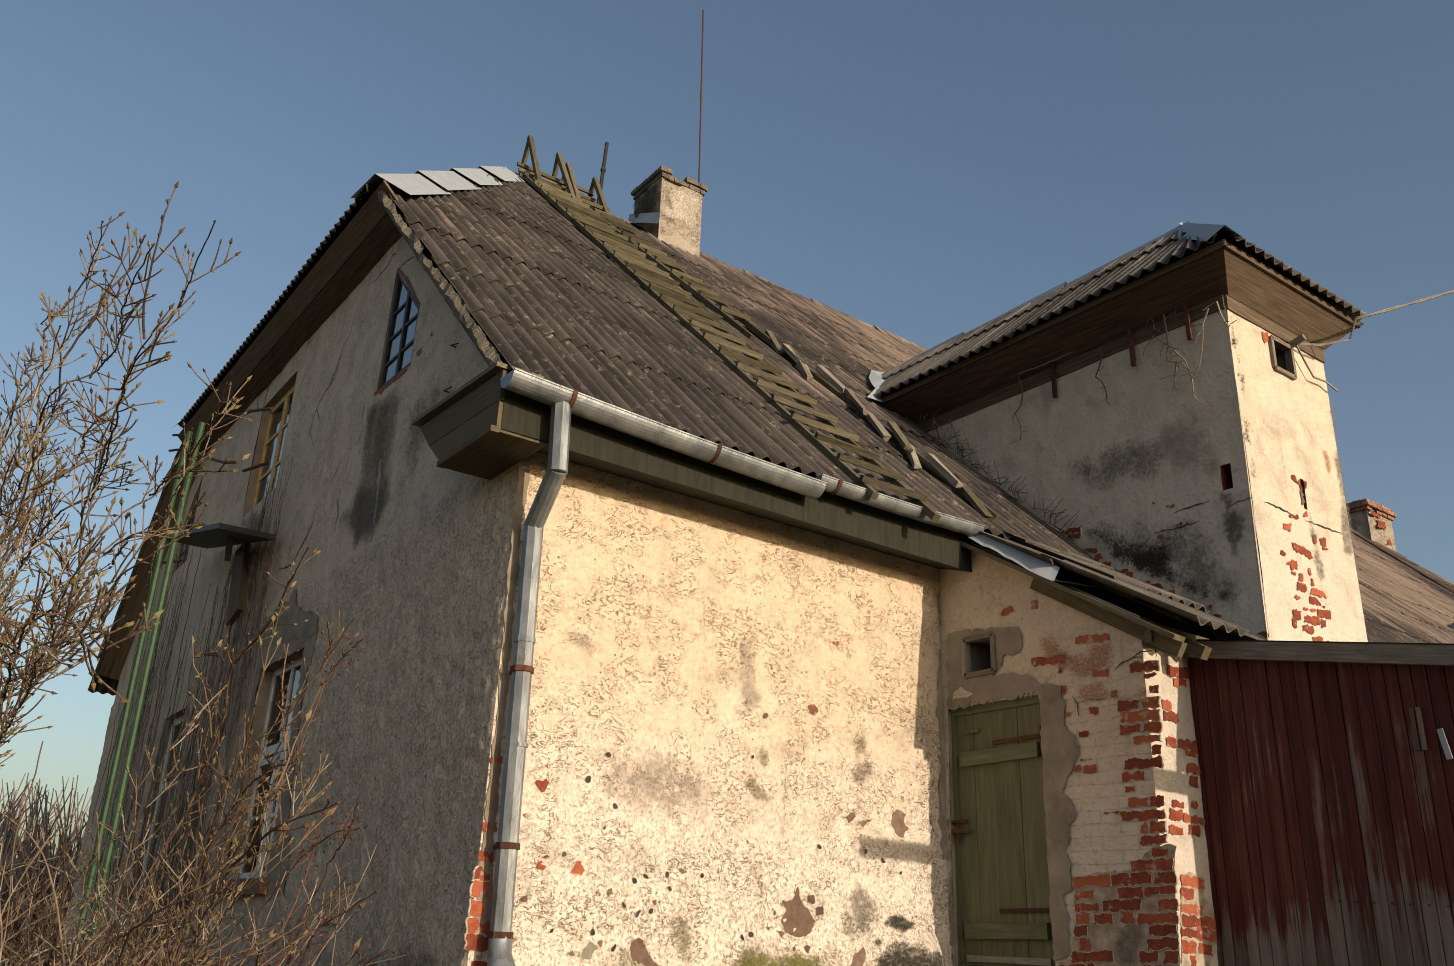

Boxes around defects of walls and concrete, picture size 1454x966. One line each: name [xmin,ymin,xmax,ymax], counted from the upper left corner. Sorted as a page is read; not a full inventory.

damp [347,392,438,539]
damp [1090,526,1234,599]
flaking render [1281,475,1331,641]
flaking render [1031,633,1217,966]
flaking render [463,850,494,966]
flaking render [741,884,824,954]
flaking render [848,944,867,966]
damp [847,890,945,966]